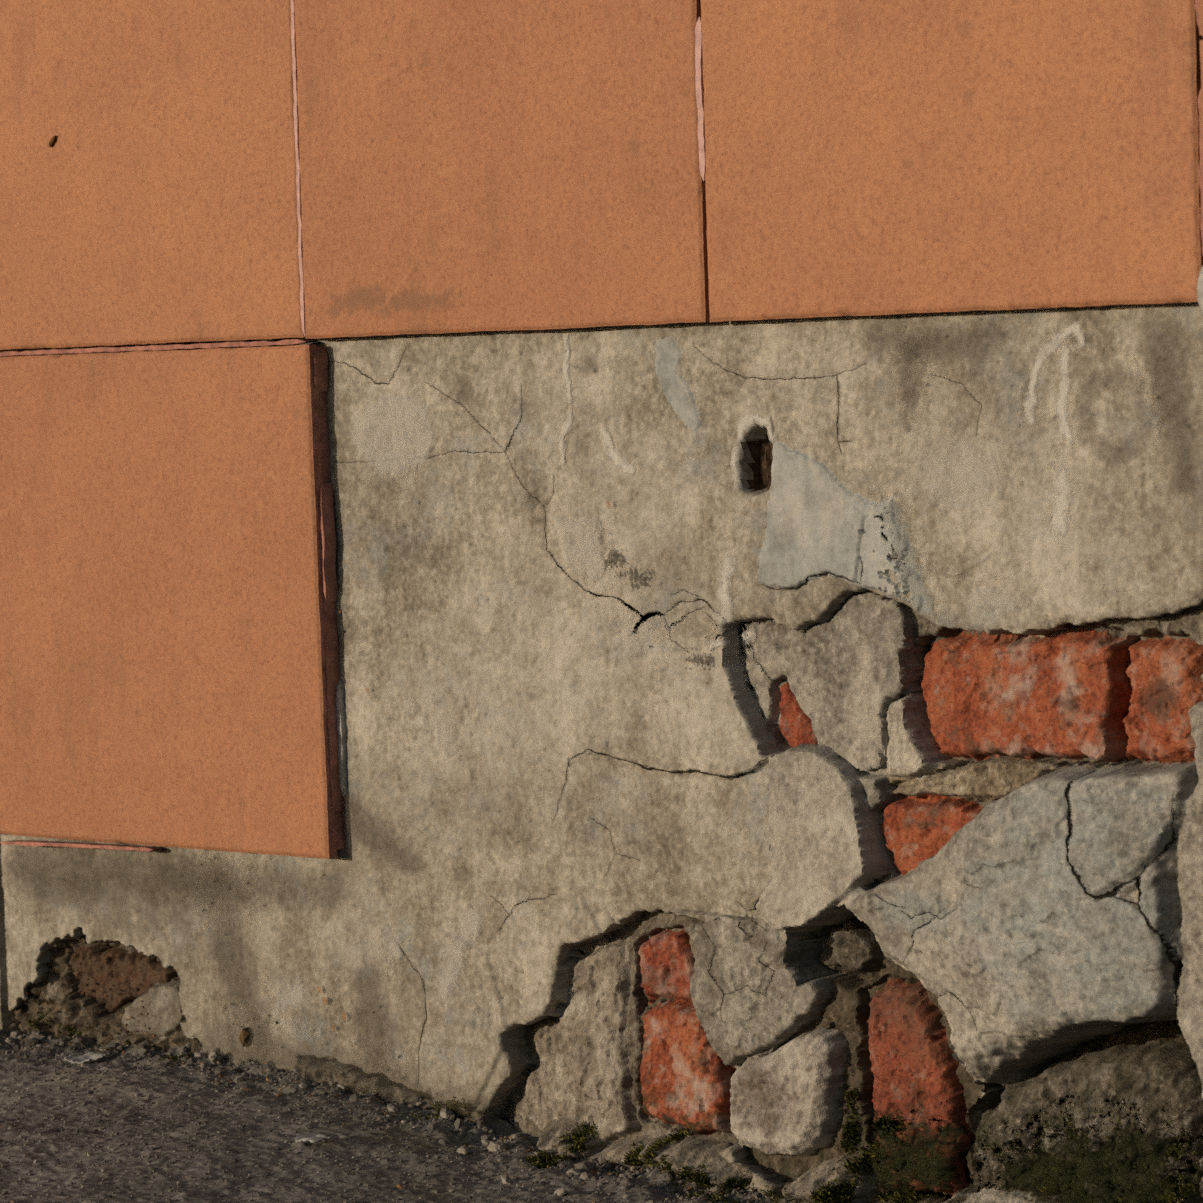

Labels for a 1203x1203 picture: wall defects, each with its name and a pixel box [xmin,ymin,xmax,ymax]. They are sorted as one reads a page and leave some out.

crack [329,348,406,385]
peeling [654,336,702,435]
crack [694,346,863,454]
crack [425,382,788,683]
crack [762,557,863,590]
crack [553,749,768,821]
spalling [500,441,1203,1203]
spalling [13,935,203,1053]
crack [395,941,427,1087]
crack [702,899,775,1018]
crack [874,892,955,963]
crack [1065,770,1182,1007]